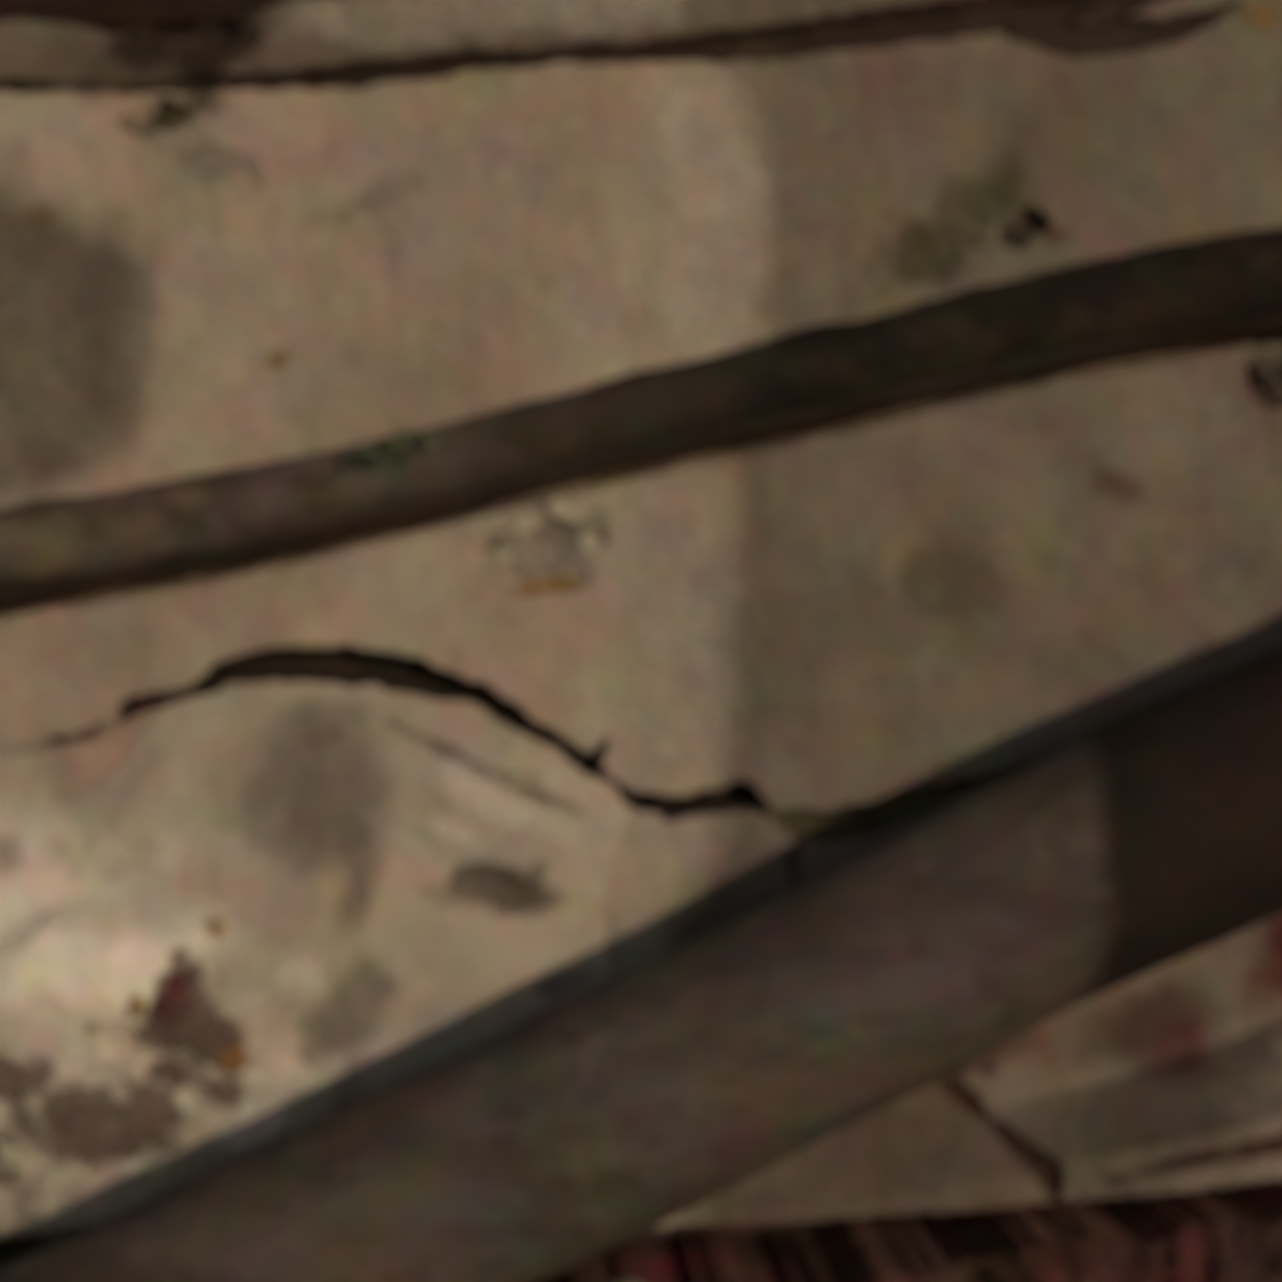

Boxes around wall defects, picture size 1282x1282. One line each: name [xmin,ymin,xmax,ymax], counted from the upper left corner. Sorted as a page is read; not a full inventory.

damp [0,204,119,481]
spalling [443,823,545,910]
crack [115,646,1040,887]
peeling [0,949,244,1194]